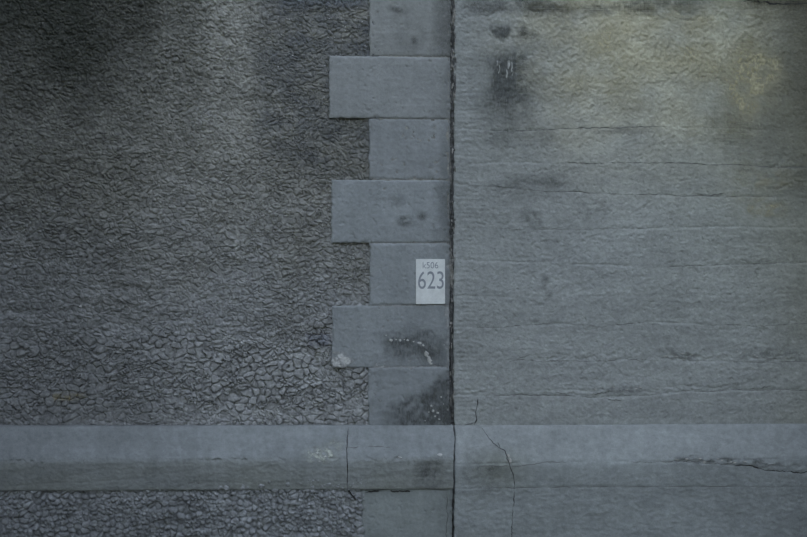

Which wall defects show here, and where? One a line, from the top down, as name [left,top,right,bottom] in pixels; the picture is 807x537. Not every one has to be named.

leakage [493,27,510,39]
leakage [491,56,526,110]
crack [346,431,410,500]
crack [466,390,663,537]
crack [630,458,807,487]